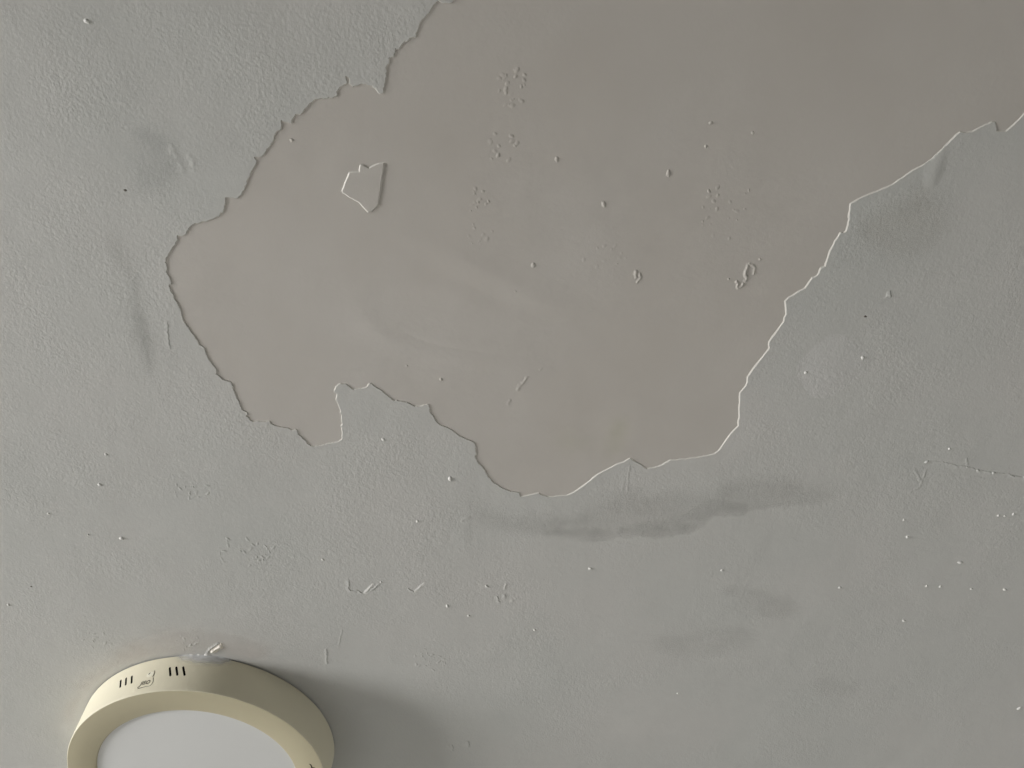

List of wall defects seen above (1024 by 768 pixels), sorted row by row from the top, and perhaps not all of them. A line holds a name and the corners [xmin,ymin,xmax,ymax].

flaking render [728,258,761,290]